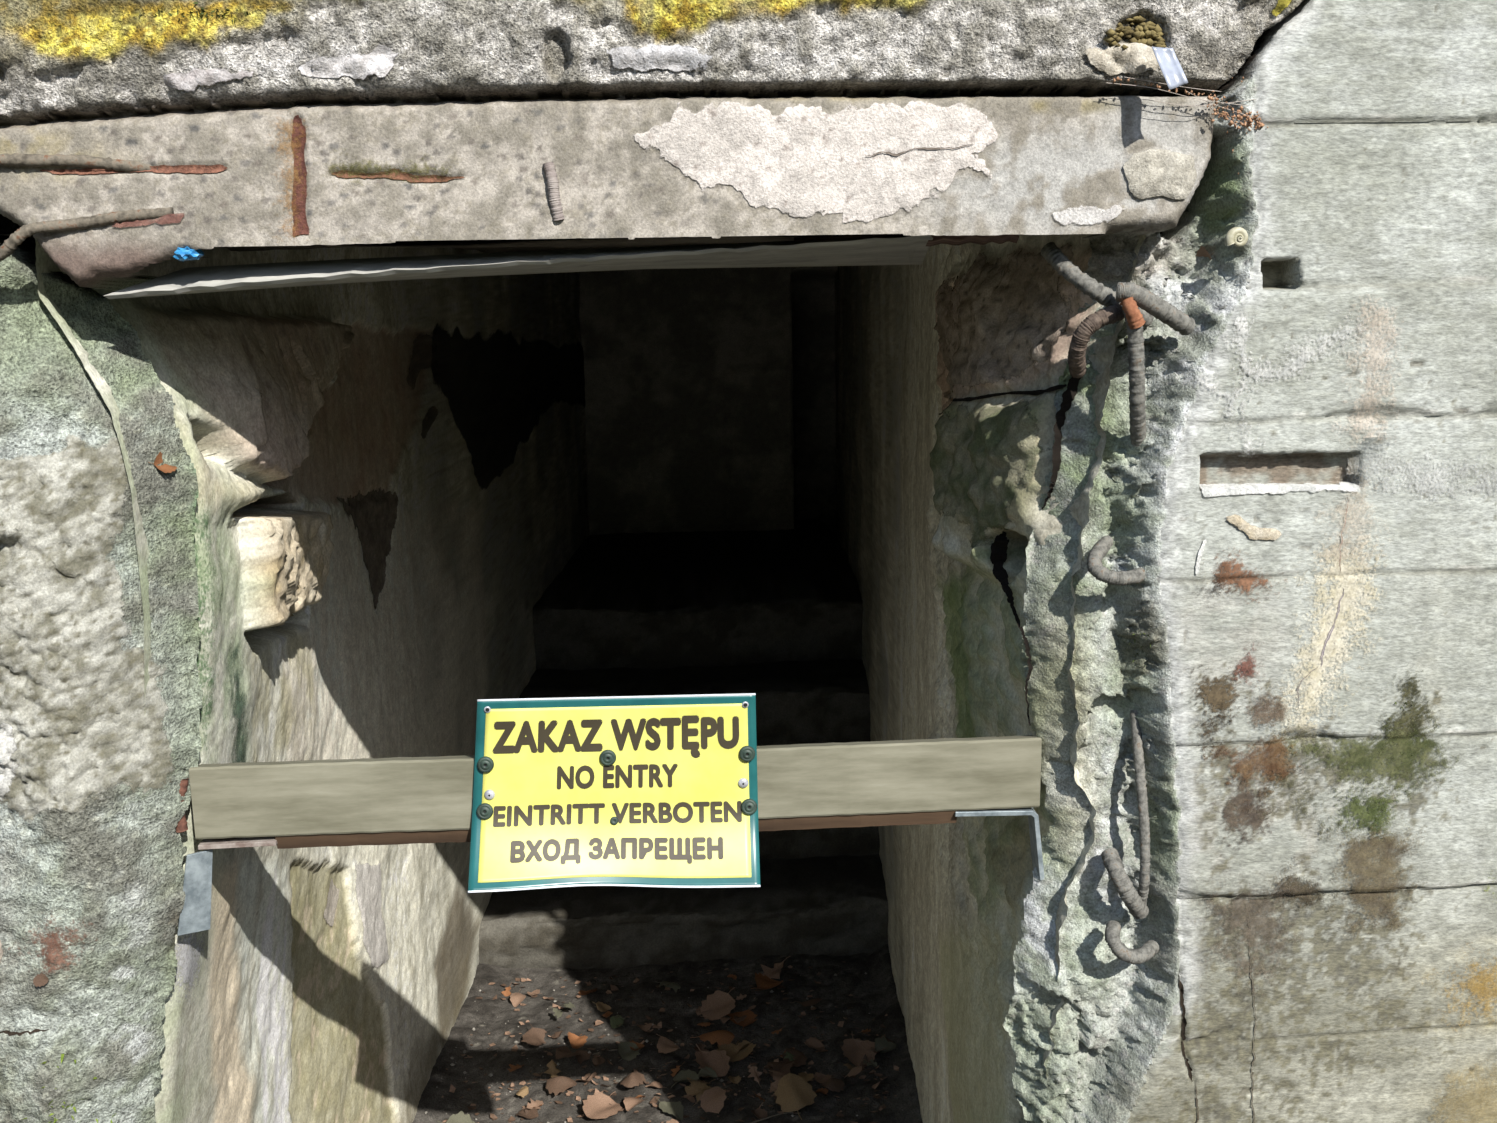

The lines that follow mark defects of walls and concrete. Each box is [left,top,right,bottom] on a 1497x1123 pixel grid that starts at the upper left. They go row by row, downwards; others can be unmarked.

corrosion [40,164,227,175]
corrosion [113,213,184,228]
corrosion [291,115,309,236]
corrosion [329,158,465,182]
peeling [634,86,998,223]
crack [939,377,1081,509]
flaking render [337,488,398,609]
crack [990,531,1033,726]
spalling [1003,74,1258,1123]
water stain [1181,536,1459,996]
crack [0,1028,49,1036]
crack [1179,970,1199,1123]